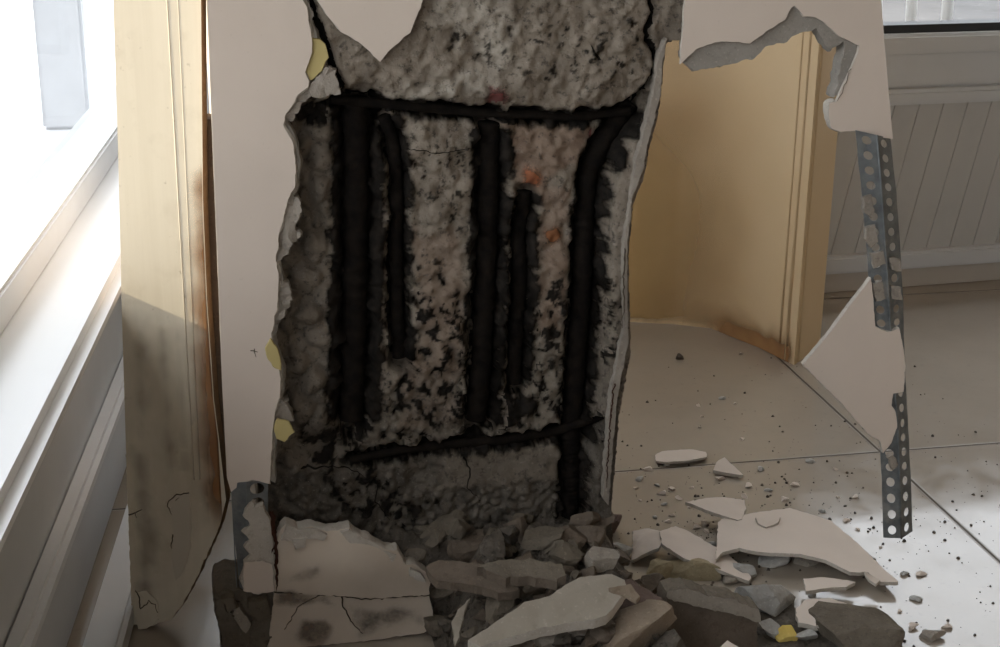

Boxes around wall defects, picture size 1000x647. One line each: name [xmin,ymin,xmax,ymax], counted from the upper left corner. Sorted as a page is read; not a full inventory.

crack [167,492,189,549]
spalling [257,0,857,548]